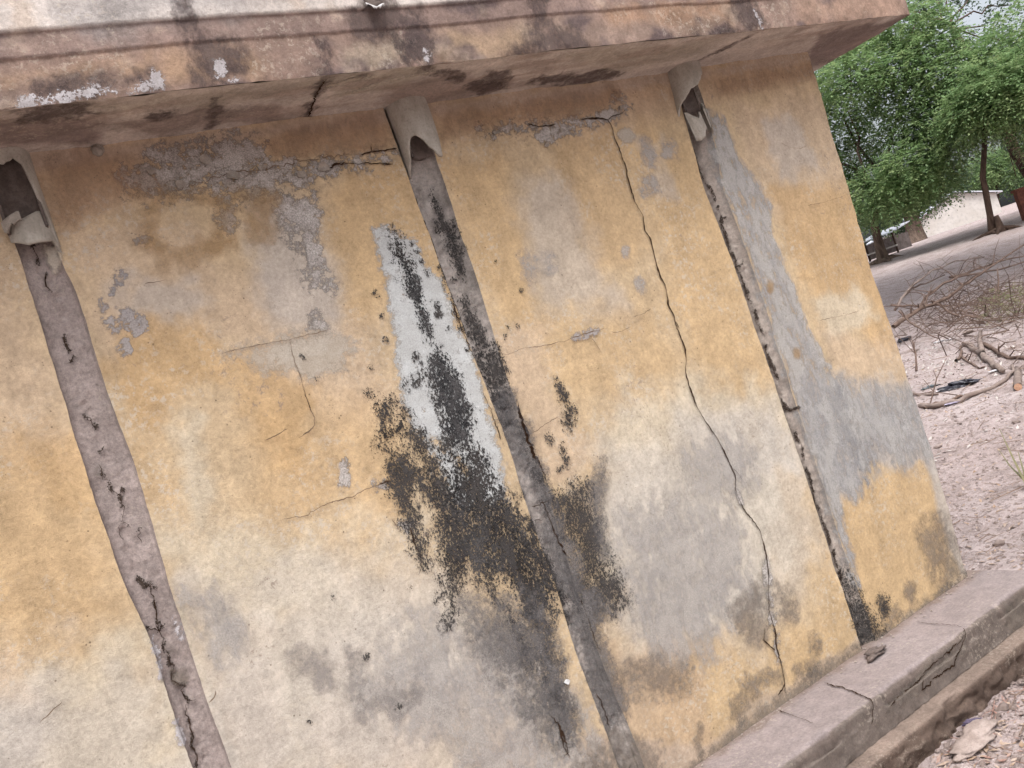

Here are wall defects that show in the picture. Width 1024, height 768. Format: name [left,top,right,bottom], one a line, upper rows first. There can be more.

damp [15,67,166,124]
damp [350,0,513,96]
peeling [114,128,400,296]
peeling [98,269,149,358]
peeling [230,308,357,381]
peeling [371,224,505,511]
crack [483,393,567,556]
damp [358,189,768,768]
crack [505,110,812,723]
crack [694,149,843,582]
damp [692,109,968,768]
crack [135,575,216,768]